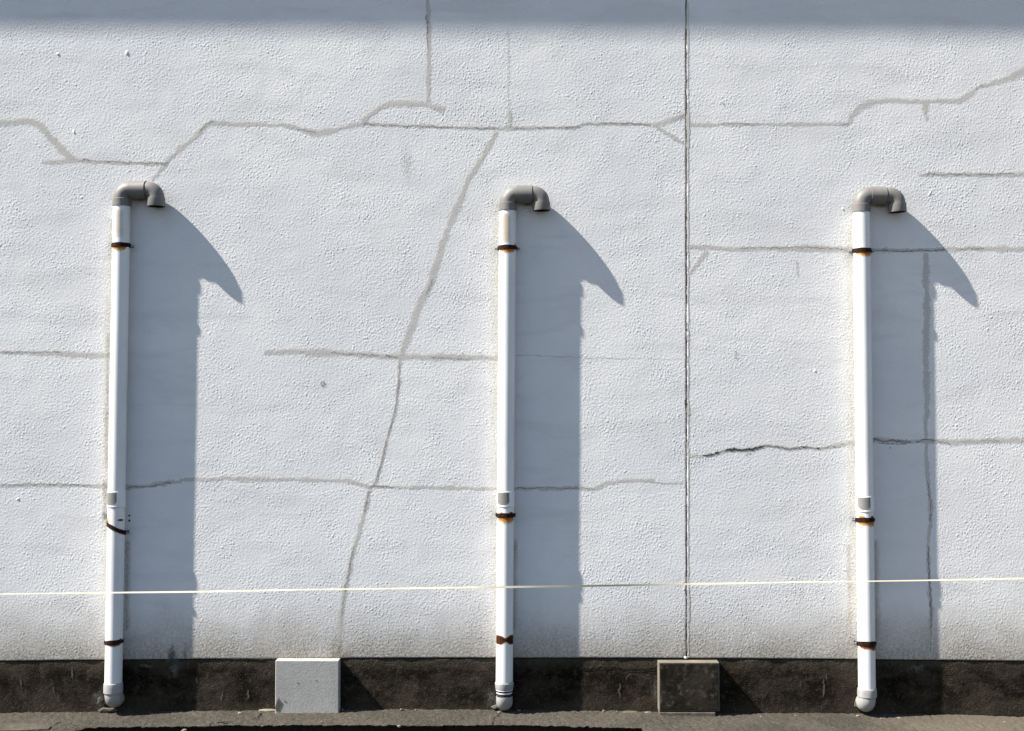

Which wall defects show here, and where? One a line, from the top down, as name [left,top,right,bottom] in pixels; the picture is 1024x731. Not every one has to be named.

crack [0,0,685,652]
crack [688,245,1024,656]
crack [689,68,1024,127]
crack [919,170,1024,178]